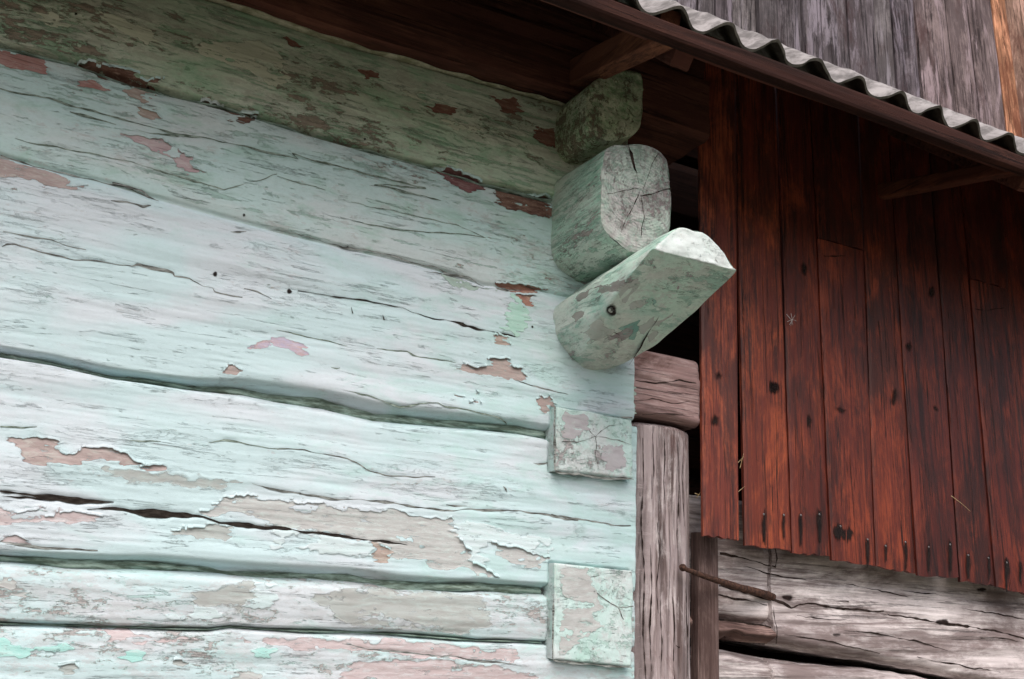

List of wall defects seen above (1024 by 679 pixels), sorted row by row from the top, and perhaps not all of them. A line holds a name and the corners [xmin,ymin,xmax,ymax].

peeling [0,49,49,74]
peeling [0,158,88,190]
crack [0,88,541,299]
peeling [433,165,553,218]
crack [608,145,671,235]
peeling [441,273,548,381]
crack [0,490,406,545]
peeling [0,434,554,578]
peeling [87,628,198,666]
peeling [165,577,279,620]
peeling [236,587,538,679]
crack [718,548,1024,672]